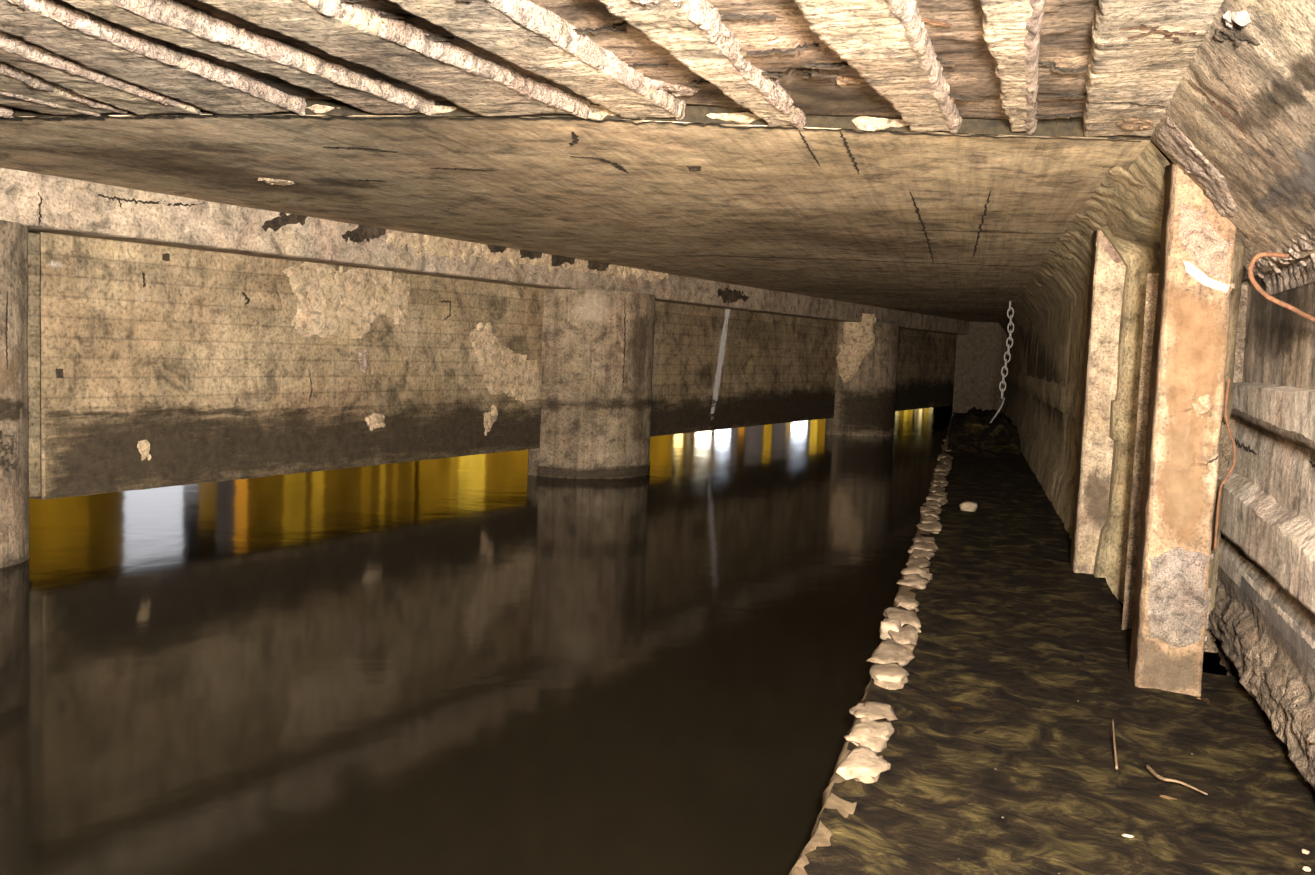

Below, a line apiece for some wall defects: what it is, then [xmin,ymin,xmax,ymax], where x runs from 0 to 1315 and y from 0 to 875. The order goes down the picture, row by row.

spalling [0,0,457,118]
spalling [300,0,618,121]
spalling [456,0,700,120]
spalling [631,0,806,130]
spalling [852,116,908,131]
spalling [885,0,962,134]
spalling [1116,116,1315,323]
peeling [283,262,410,373]
leakage [47,309,954,498]
spalling [470,322,539,436]
spalling [836,314,876,383]
peeling [1141,378,1315,648]